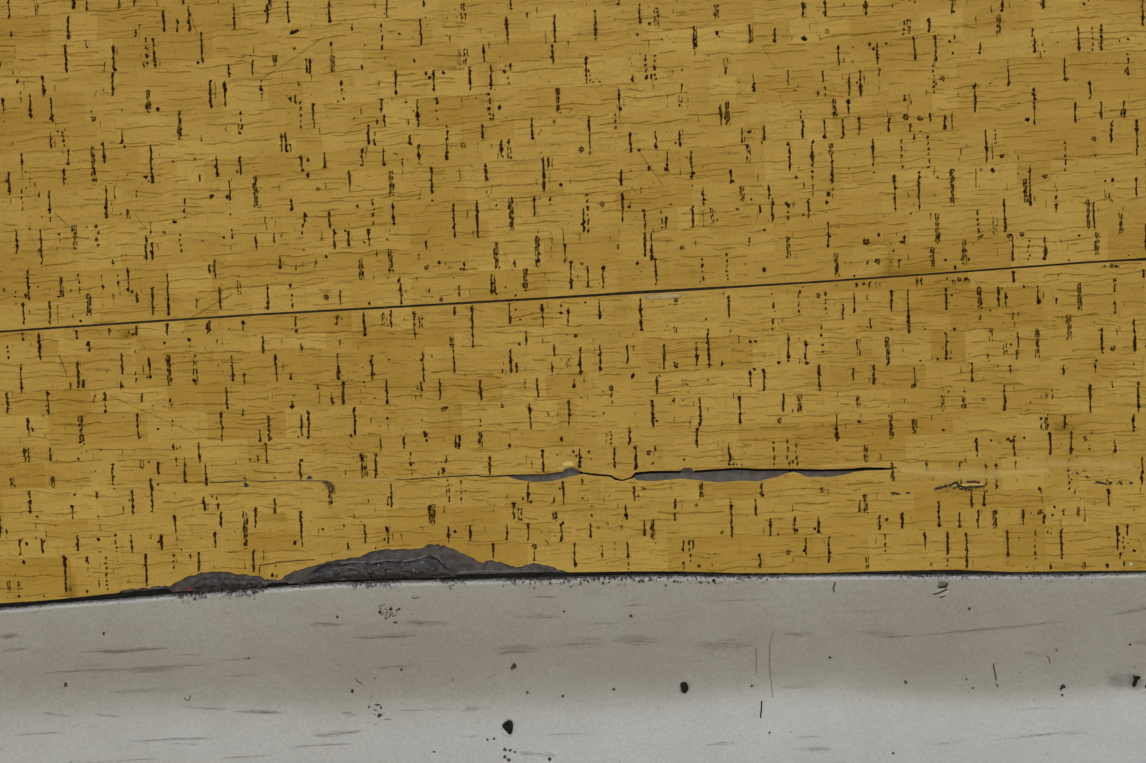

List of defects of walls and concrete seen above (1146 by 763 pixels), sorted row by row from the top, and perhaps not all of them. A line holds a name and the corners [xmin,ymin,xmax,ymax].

crack [397,461,1049,483]
spalling [121,544,565,593]